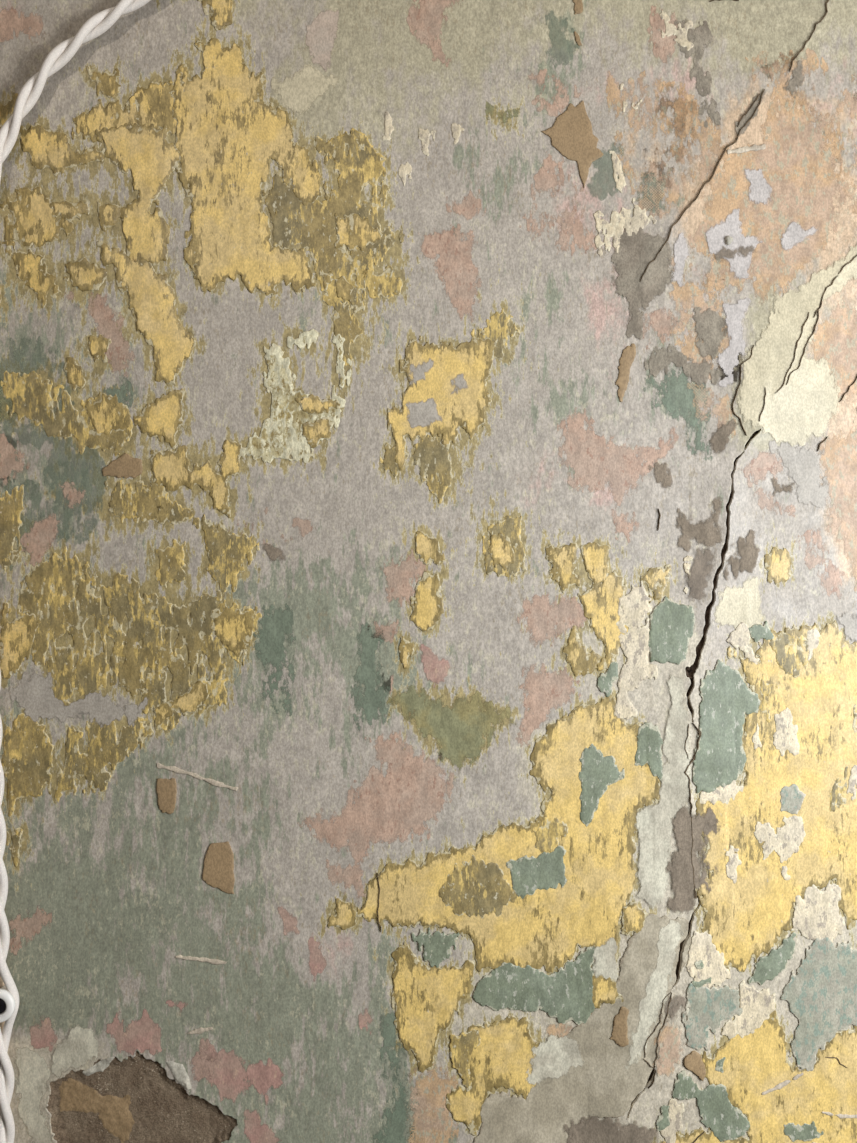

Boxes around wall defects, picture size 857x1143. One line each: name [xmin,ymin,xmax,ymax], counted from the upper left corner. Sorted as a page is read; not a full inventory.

peeling [529,69,626,193]
flaking render [659,11,721,127]
crack [640,88,766,282]
crack [789,0,829,72]
peeling [0,0,415,867]
flaking render [612,222,727,402]
peeling [812,301,857,400]
crack [627,255,857,1115]
peeling [666,621,857,988]
peeling [327,696,661,1143]
flaking render [46,1051,279,1143]
peeling [564,1008,857,1143]